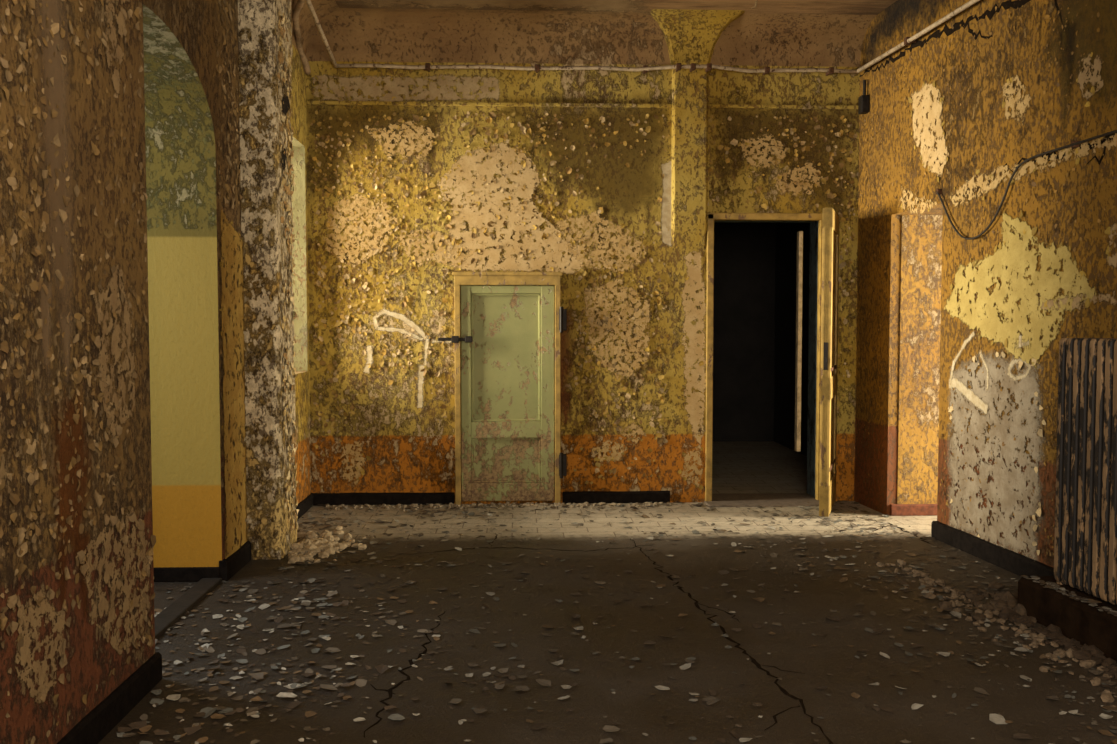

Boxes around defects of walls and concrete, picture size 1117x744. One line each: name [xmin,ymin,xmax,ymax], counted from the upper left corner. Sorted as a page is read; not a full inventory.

peeling [310,73,706,490]
flaking render [708,0,1117,559]
crack [398,534,834,744]